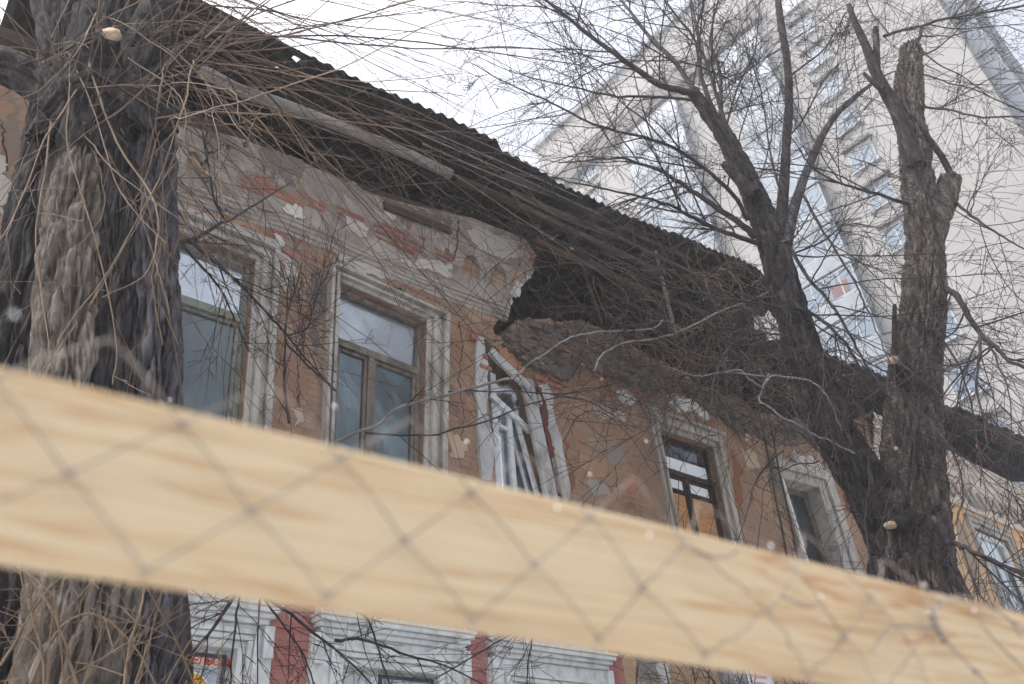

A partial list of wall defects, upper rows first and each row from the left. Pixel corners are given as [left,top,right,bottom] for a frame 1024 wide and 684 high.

flaking render [240,173,471,279]
flaking render [181,201,318,335]
flaking render [336,254,448,305]
flaking render [490,251,535,305]
spalling [448,384,471,458]